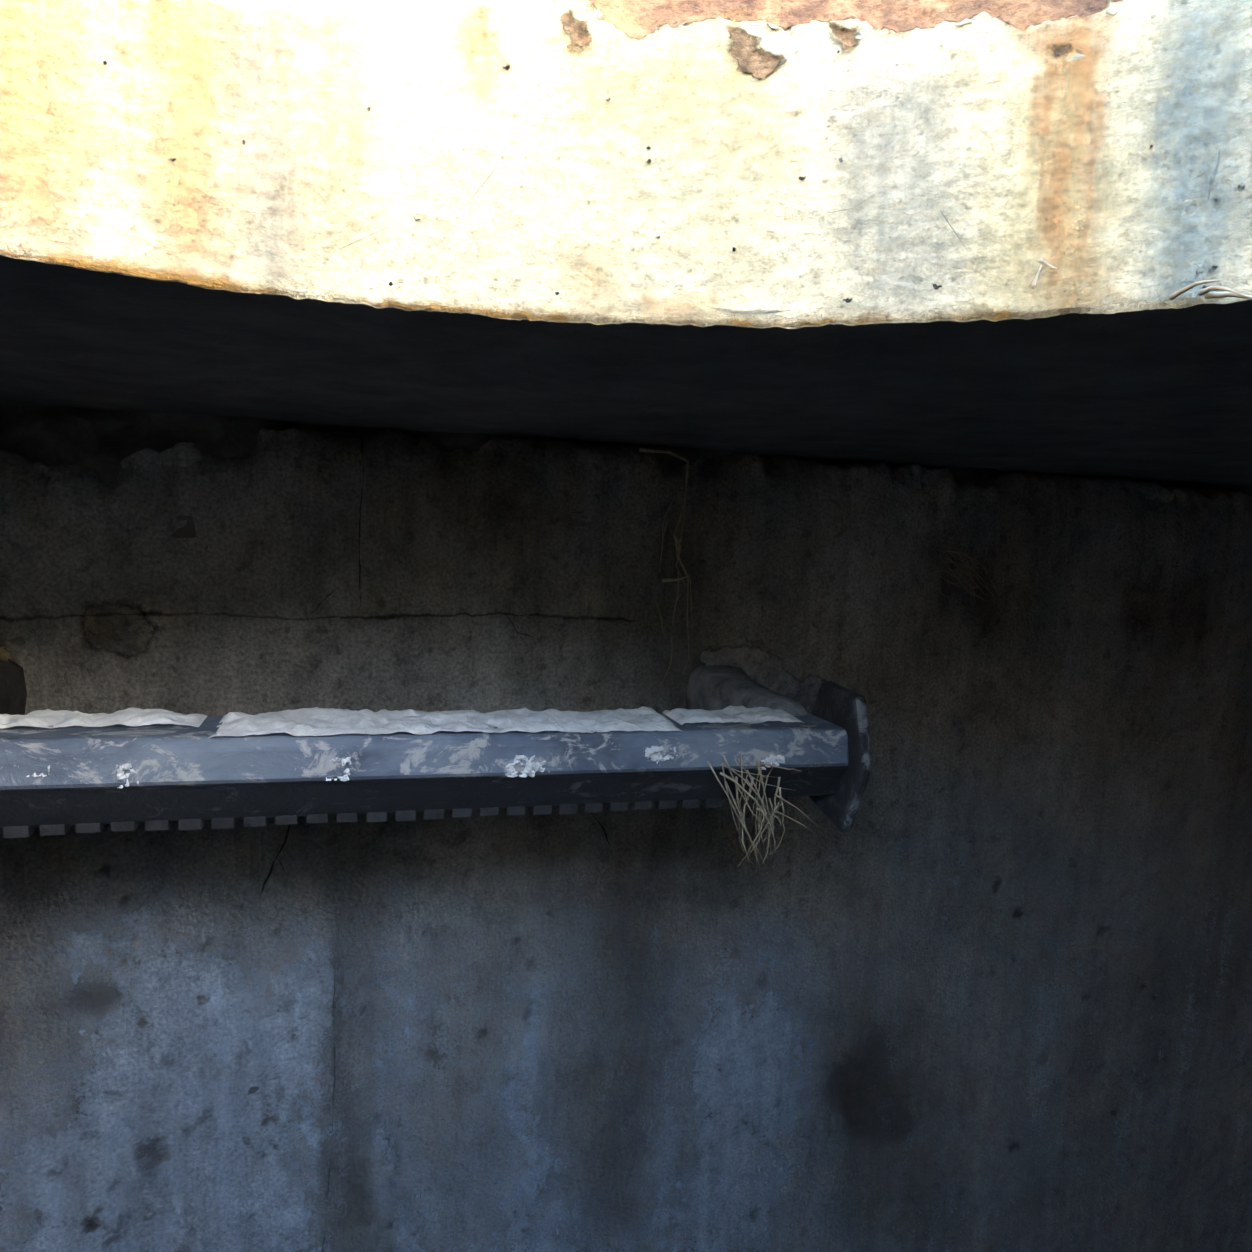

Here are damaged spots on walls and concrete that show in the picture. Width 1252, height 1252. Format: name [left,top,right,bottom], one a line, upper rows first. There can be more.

peeling [559,0,1121,82]